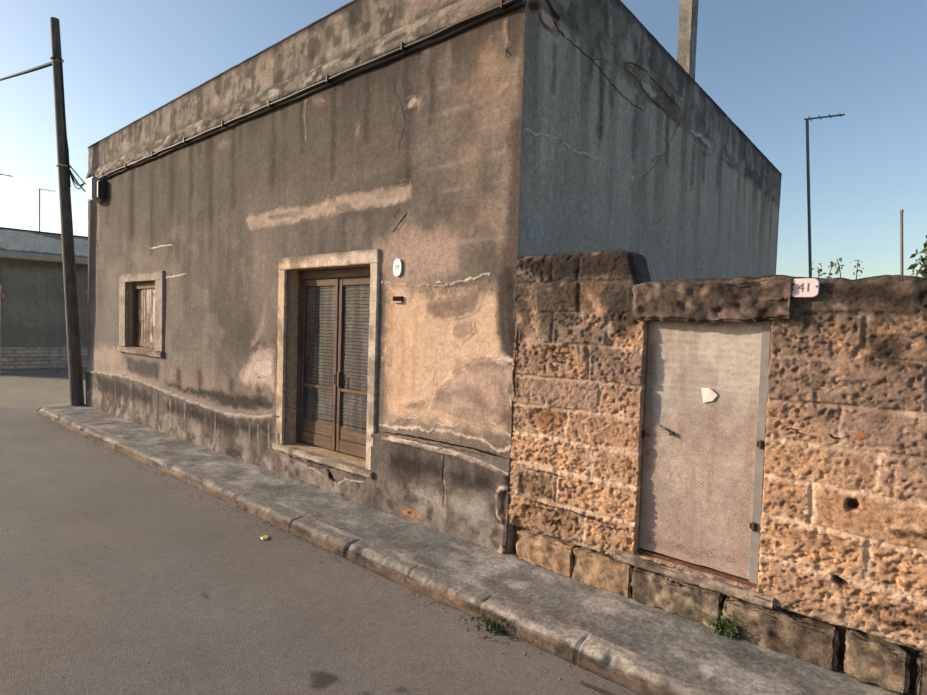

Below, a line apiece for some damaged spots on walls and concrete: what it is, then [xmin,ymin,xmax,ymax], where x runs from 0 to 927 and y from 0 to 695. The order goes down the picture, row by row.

crack [524,128,599,160]
crack [568,39,643,111]
spalling [621,60,711,156]
peeling [247,184,411,230]
damp [87,359,273,445]
peeling [238,304,276,393]
peeling [379,273,513,453]
crack [385,432,564,518]
crack [525,497,611,525]